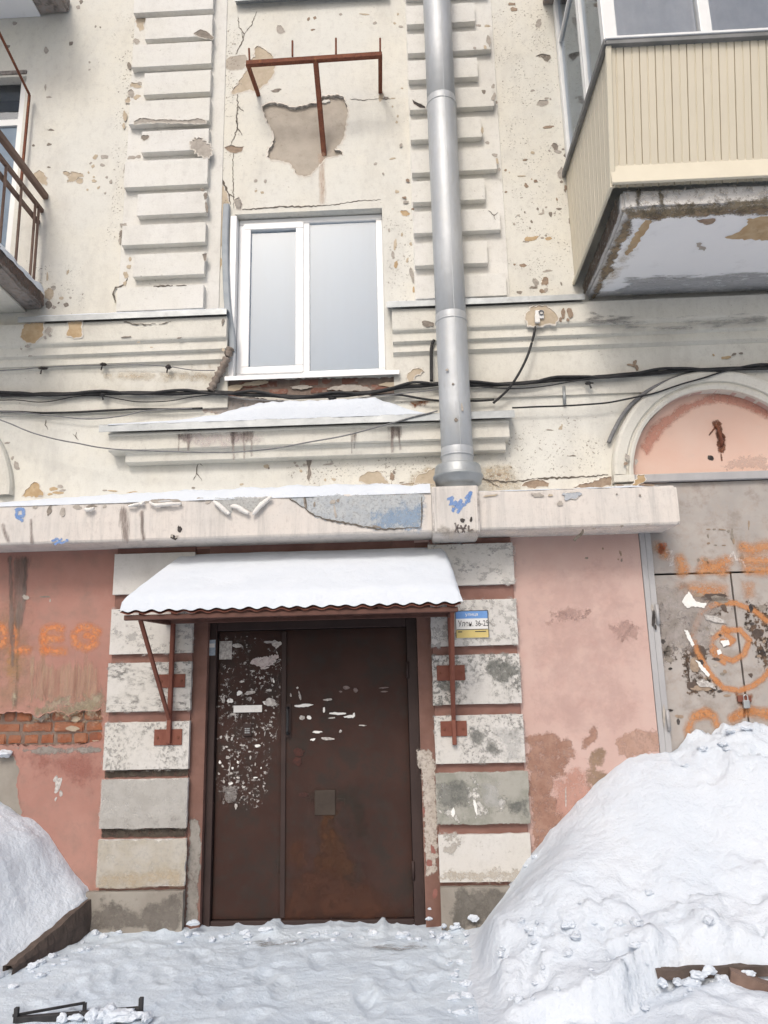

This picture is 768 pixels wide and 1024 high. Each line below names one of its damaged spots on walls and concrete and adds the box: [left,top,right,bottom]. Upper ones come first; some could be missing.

flaking render [225,31,350,178]
crack [222,94,381,210]
flaking render [473,3,573,327]
flaking render [724,215,768,241]
flaking render [36,267,83,339]
leakage [230,431,251,459]
peeling [288,457,436,530]
crack [483,474,608,486]
corrosion [709,420,726,461]
leakage [9,557,27,705]
flaking render [0,700,138,817]
peeling [416,704,684,876]